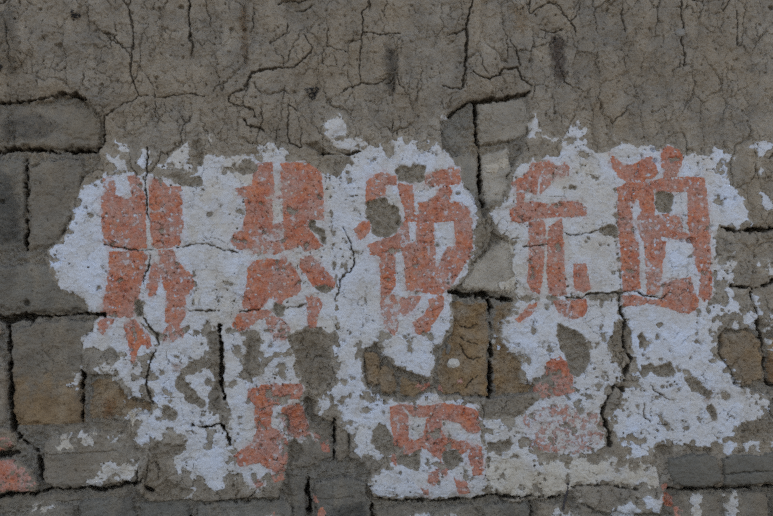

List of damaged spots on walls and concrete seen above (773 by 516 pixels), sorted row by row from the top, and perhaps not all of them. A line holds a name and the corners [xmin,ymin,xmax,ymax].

crack [103,0,205,135]
crack [227,0,314,132]
crack [343,0,401,92]
crack [442,0,533,90]
crack [528,0,581,36]
crack [142,146,150,218]
peeling [422,218,467,269]
peeling [512,158,536,182]
peeling [646,186,695,236]
peeling [671,146,754,298]
peeling [749,141,773,175]
peeling [708,286,742,317]